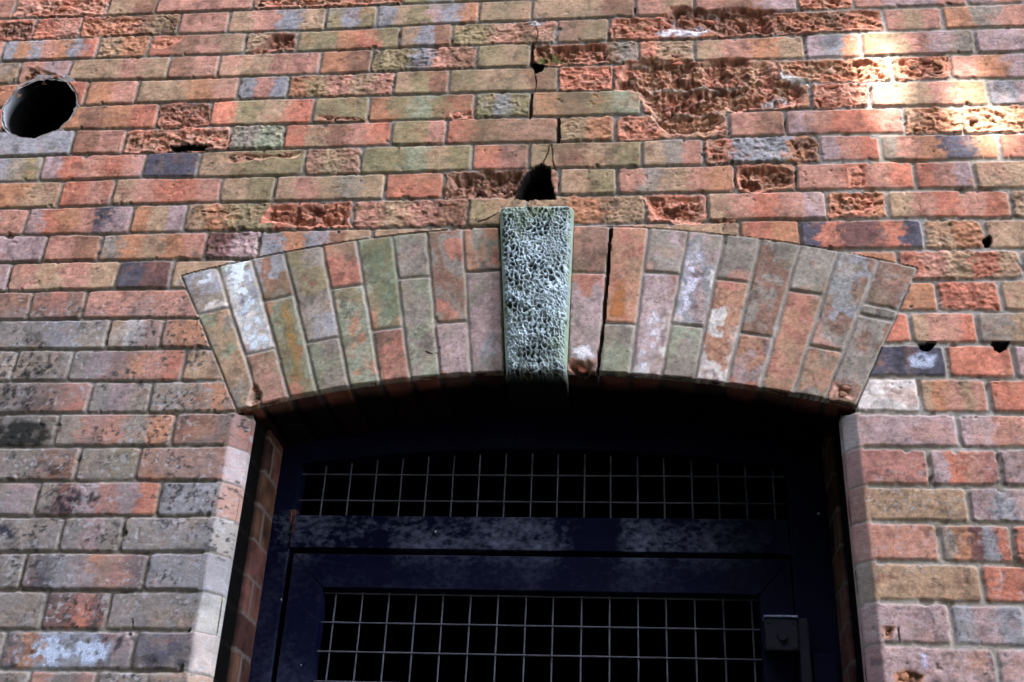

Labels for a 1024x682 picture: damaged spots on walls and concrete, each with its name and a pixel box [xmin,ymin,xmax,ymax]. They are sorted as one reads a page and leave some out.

spalling [124,103,303,164]
crack [528,22,562,171]
spalling [533,0,952,194]
spalling [905,104,1024,136]
spalling [259,201,354,231]
spalling [443,167,528,202]
spalling [642,194,736,227]
spalling [826,163,886,219]
crack [597,228,613,383]